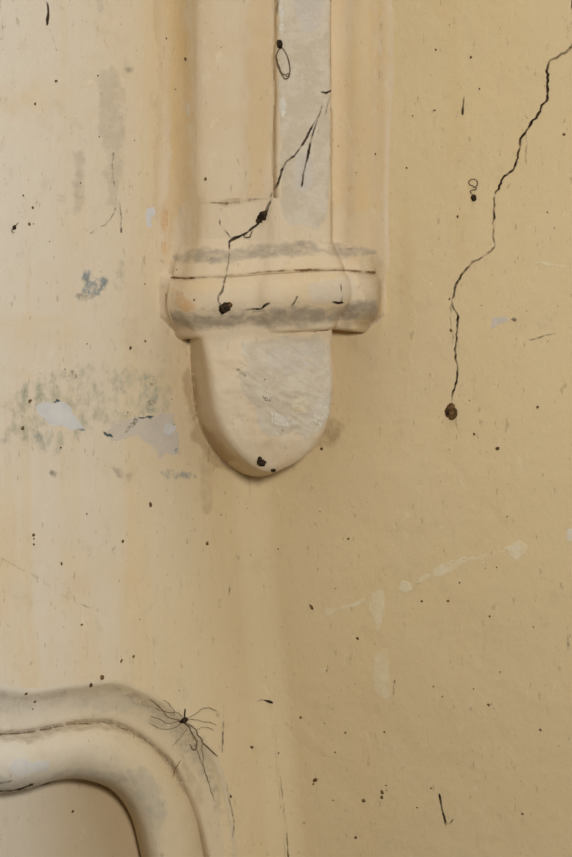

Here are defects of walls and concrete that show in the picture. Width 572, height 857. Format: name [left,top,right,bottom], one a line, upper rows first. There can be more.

crack [227,125,315,248]
crack [493,46,572,220]
crack [452,248,494,394]
peeling [36,399,85,431]
peeling [103,412,181,459]